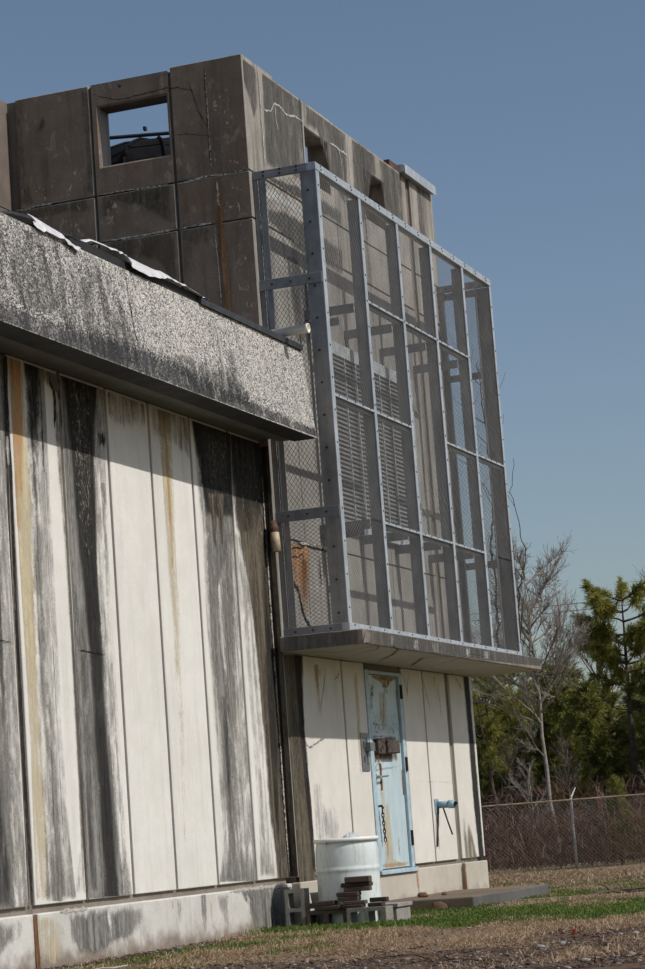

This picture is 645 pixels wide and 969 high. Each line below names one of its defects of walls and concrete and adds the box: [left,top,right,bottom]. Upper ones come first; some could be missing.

crack [93,67,212,173]
crack [258,73,303,161]
leakage [12,235,76,340]
leakage [83,266,139,365]
leakage [174,332,252,406]
rust [159,410,178,636]
rust [291,543,309,604]
leakage [0,355,29,909]
leakage [24,363,541,952]
leakage [0,925,12,952]